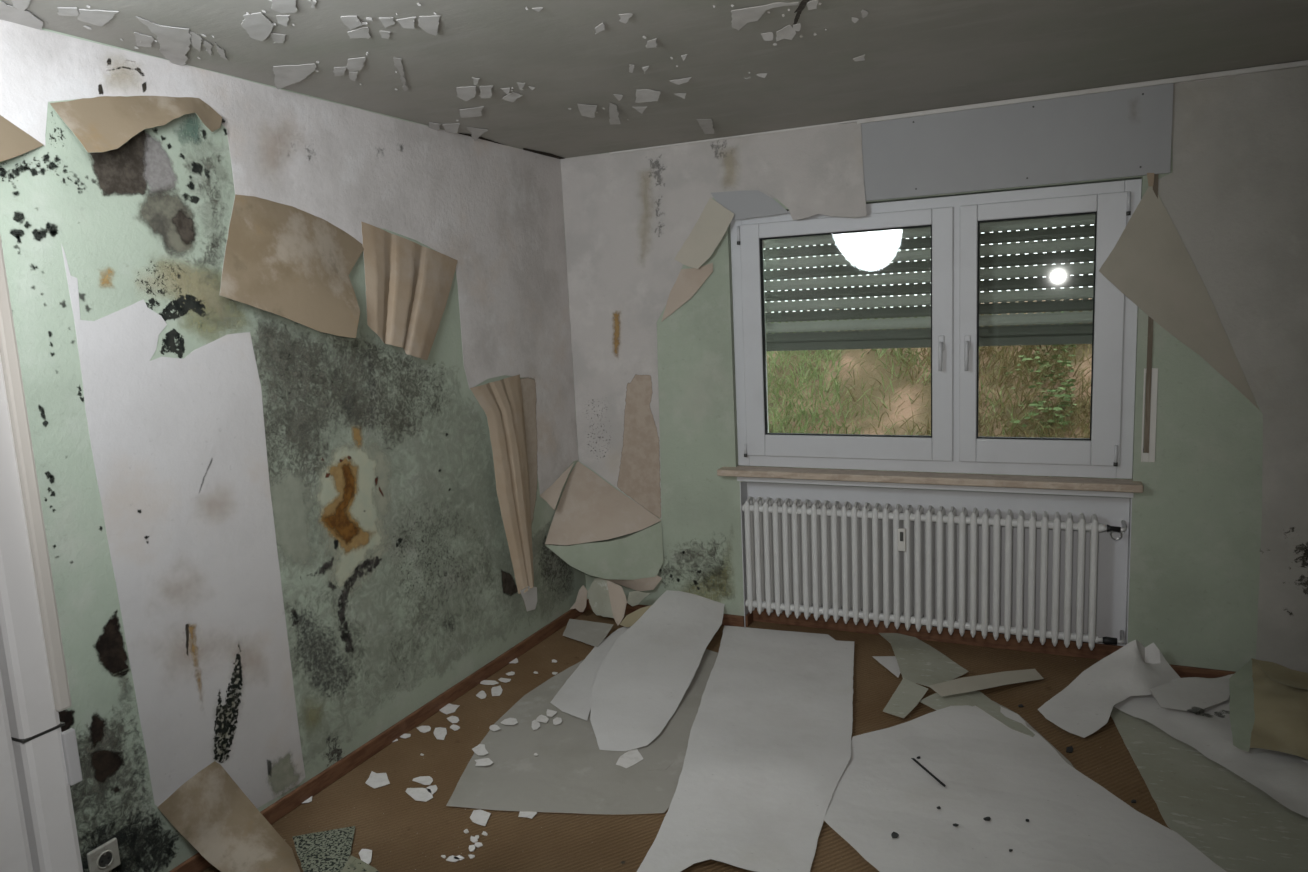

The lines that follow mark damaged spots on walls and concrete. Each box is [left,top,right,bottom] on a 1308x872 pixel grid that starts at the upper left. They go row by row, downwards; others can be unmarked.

peeling [241,0,317,43]
peeling [273,3,440,91]
peeling [731,0,826,46]
peeling [429,77,535,141]
peeling [568,54,691,125]
flaking render [711,190,789,220]
damp [0,111,442,493]
damp [291,514,462,697]
damp [94,611,130,690]
damp [58,710,74,732]
damp [213,645,243,763]
damp [70,714,178,872]